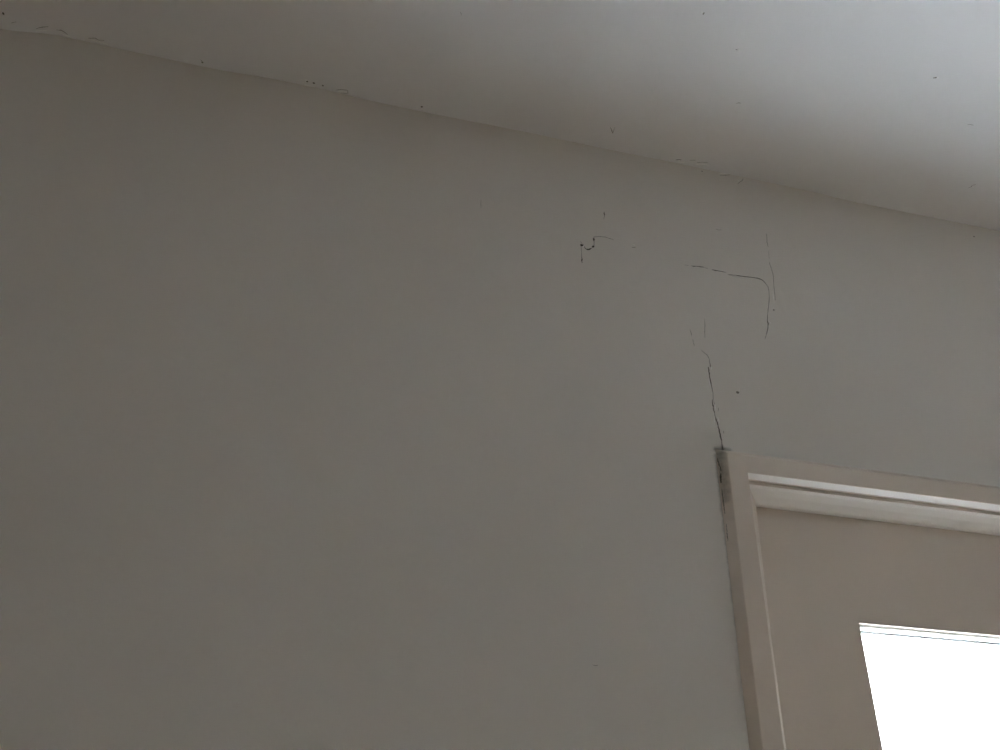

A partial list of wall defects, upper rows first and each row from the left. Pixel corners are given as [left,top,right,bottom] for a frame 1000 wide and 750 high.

crack [688,234,775,338]
crack [690,331,728,539]